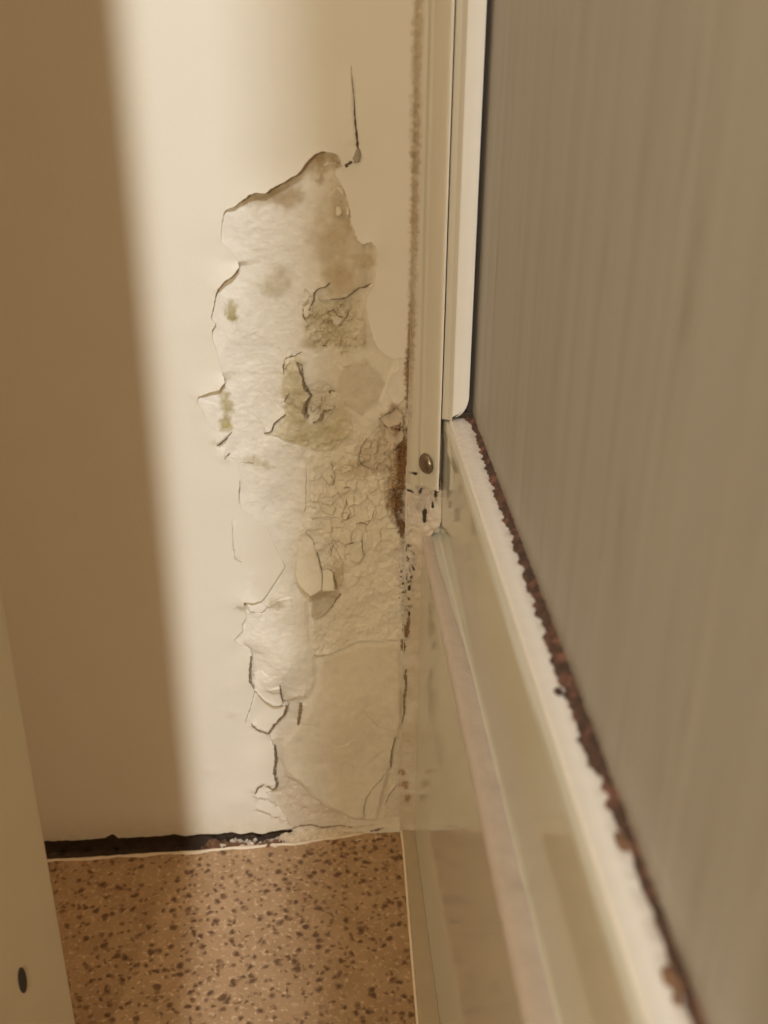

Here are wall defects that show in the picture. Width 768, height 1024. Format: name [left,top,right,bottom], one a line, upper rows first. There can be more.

peeling [197,151,409,629]
peeling [267,655,402,832]